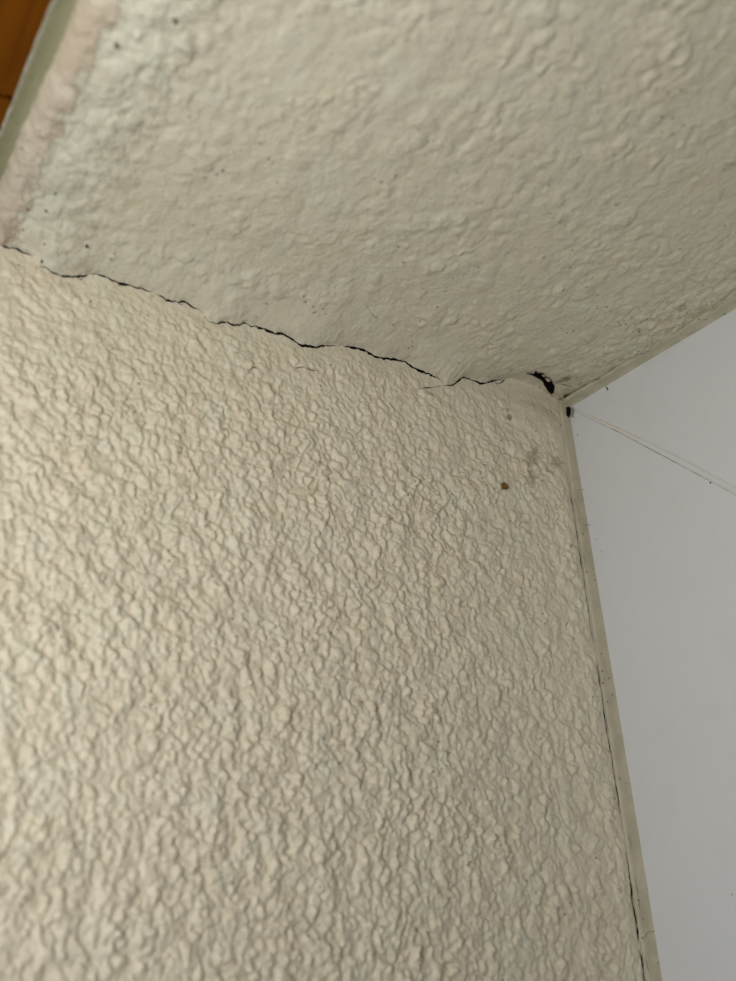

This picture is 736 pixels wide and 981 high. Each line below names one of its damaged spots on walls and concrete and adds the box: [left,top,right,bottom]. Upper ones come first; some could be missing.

crack [0,245,505,396]